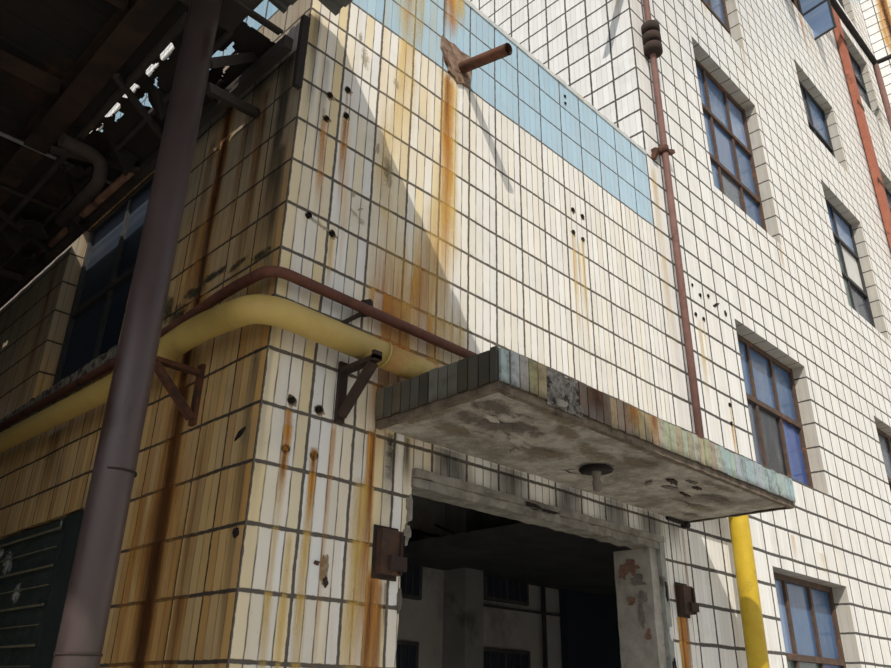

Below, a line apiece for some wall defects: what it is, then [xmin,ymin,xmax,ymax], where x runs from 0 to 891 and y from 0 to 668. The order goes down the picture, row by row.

rust [445,0,463,25]
rust [878,0,891,47]
rust [442,75,455,224]
spalling [546,368,584,418]
spalling [314,554,329,588]
peeling [618,559,652,640]
rust [678,617,690,668]